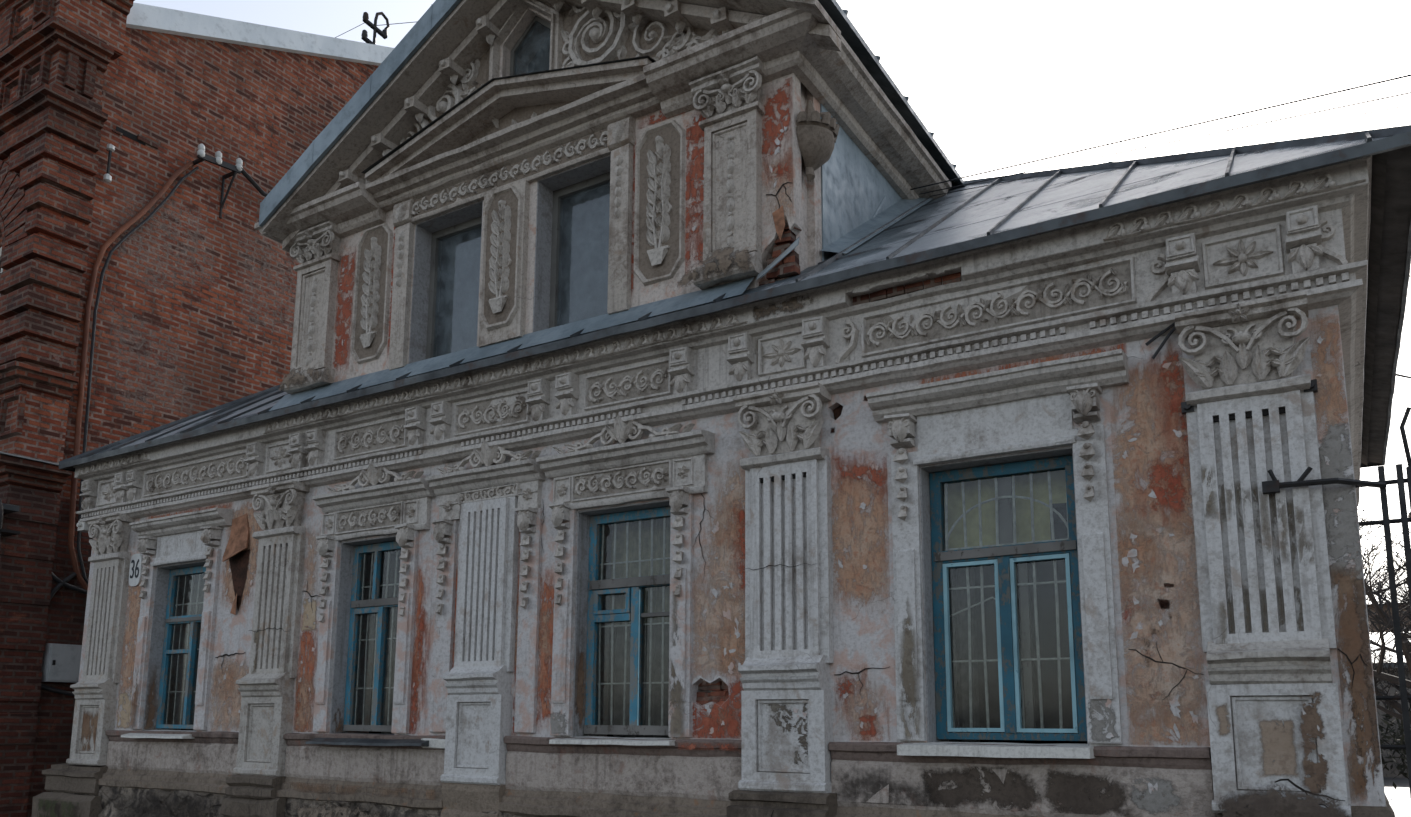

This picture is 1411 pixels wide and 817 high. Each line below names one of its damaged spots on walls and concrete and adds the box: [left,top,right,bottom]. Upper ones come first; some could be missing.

spalling [640,80,802,287]
crack [766,182,792,208]
peeling [279,252,356,391]
peeling [921,343,1125,384]
flaking render [1311,318,1363,585]
peeling [294,535,317,732]
peeling [681,467,745,750]
peeling [837,679,879,737]
peeling [832,457,889,604]
peeling [1088,352,1230,746]
crack [1128,642,1204,700]
flaking render [1259,692,1329,794]